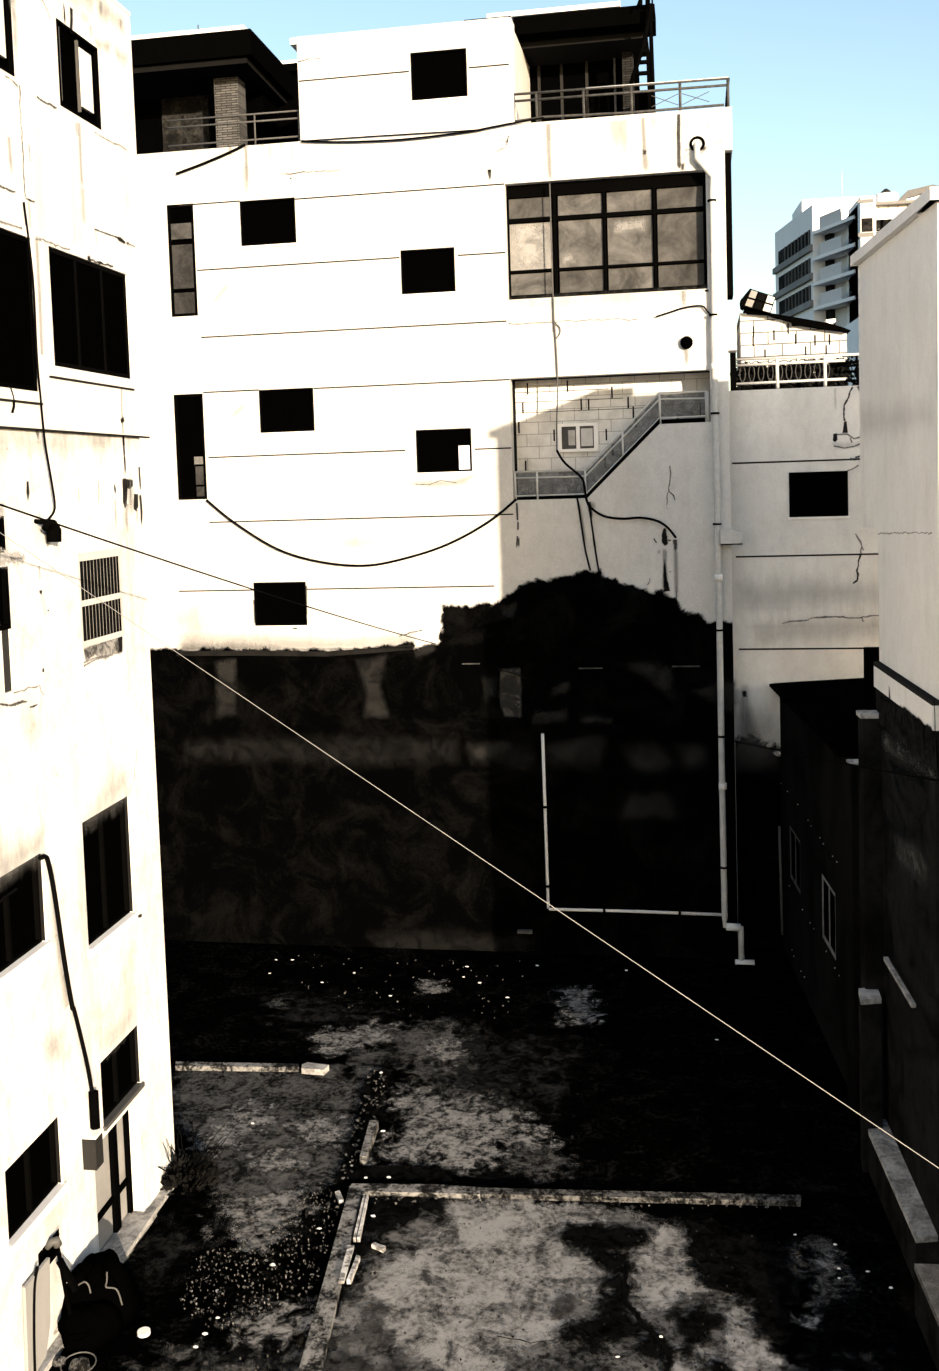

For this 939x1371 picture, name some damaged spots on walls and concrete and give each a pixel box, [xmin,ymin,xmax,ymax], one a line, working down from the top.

crack [853,532,932,584]
crack [782,615,879,624]
crack [0,685,44,708]